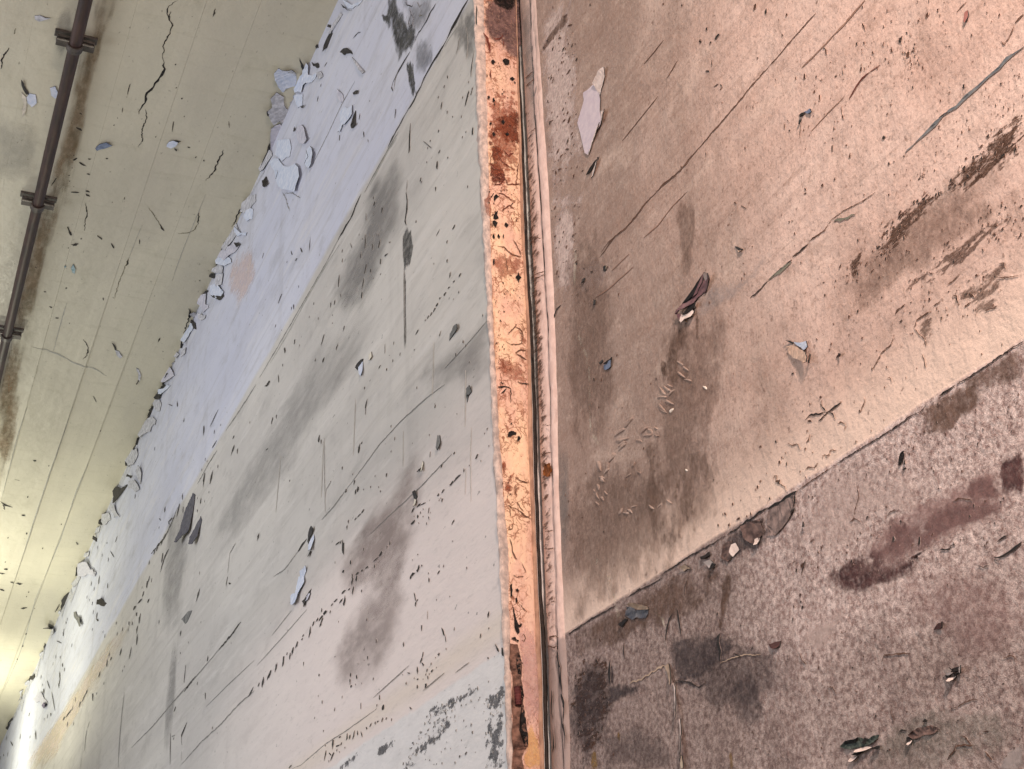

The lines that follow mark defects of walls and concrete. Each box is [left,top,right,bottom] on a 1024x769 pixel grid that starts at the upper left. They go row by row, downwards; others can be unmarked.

crack [139,0,178,145]
rust [488,92,520,183]
flaking render [542,6,607,305]
leakage [952,116,1024,191]
crack [199,0,468,481]
leakage [403,230,412,344]
leakage [914,220,1006,284]
peeling [0,0,364,759]
crack [151,508,178,573]
peeling [258,509,391,687]
leakage [831,454,1024,591]
spalling [402,584,540,769]